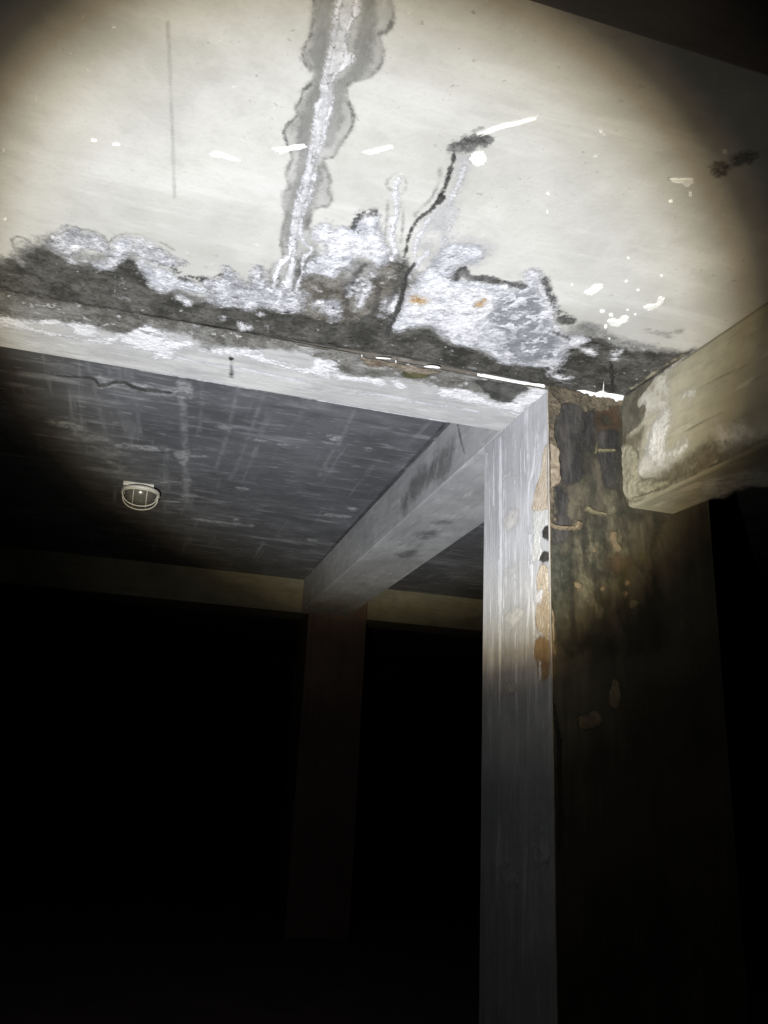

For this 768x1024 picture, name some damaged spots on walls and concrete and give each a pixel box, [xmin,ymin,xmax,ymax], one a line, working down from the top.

crack [65,375,195,399]
leakage [0,0,768,656]
crack [384,134,494,339]
flaking render [532,385,622,680]